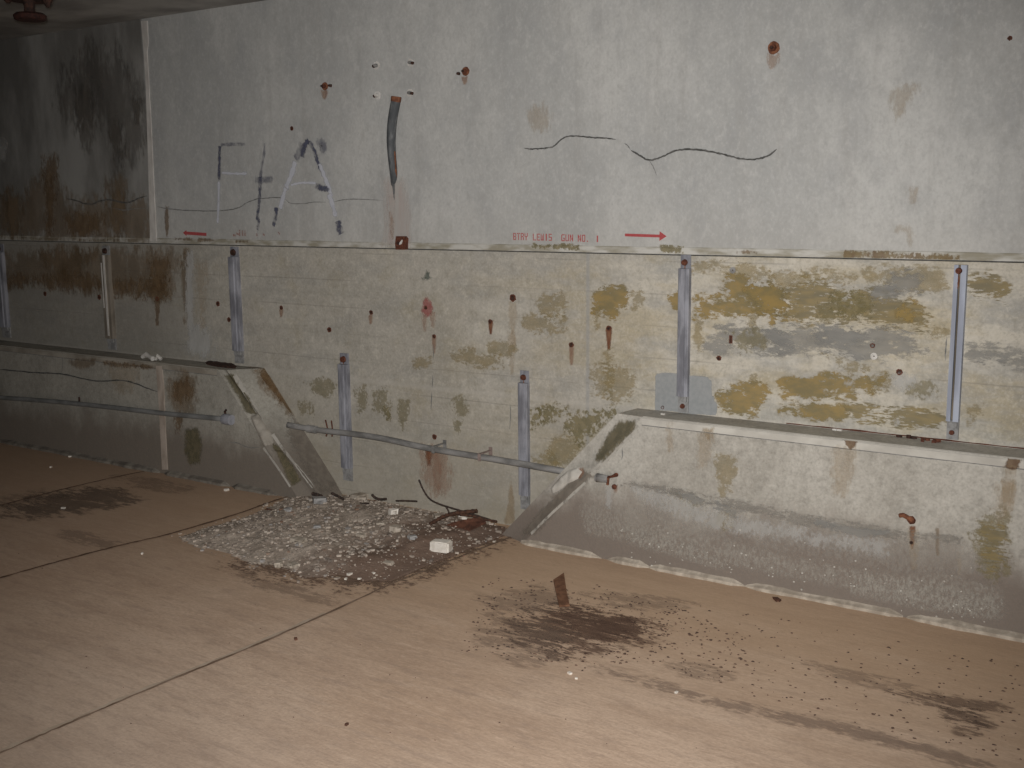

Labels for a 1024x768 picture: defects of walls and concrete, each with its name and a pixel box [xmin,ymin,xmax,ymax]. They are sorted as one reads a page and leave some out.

crack [525,135,777,173]
crack [0,358,157,392]